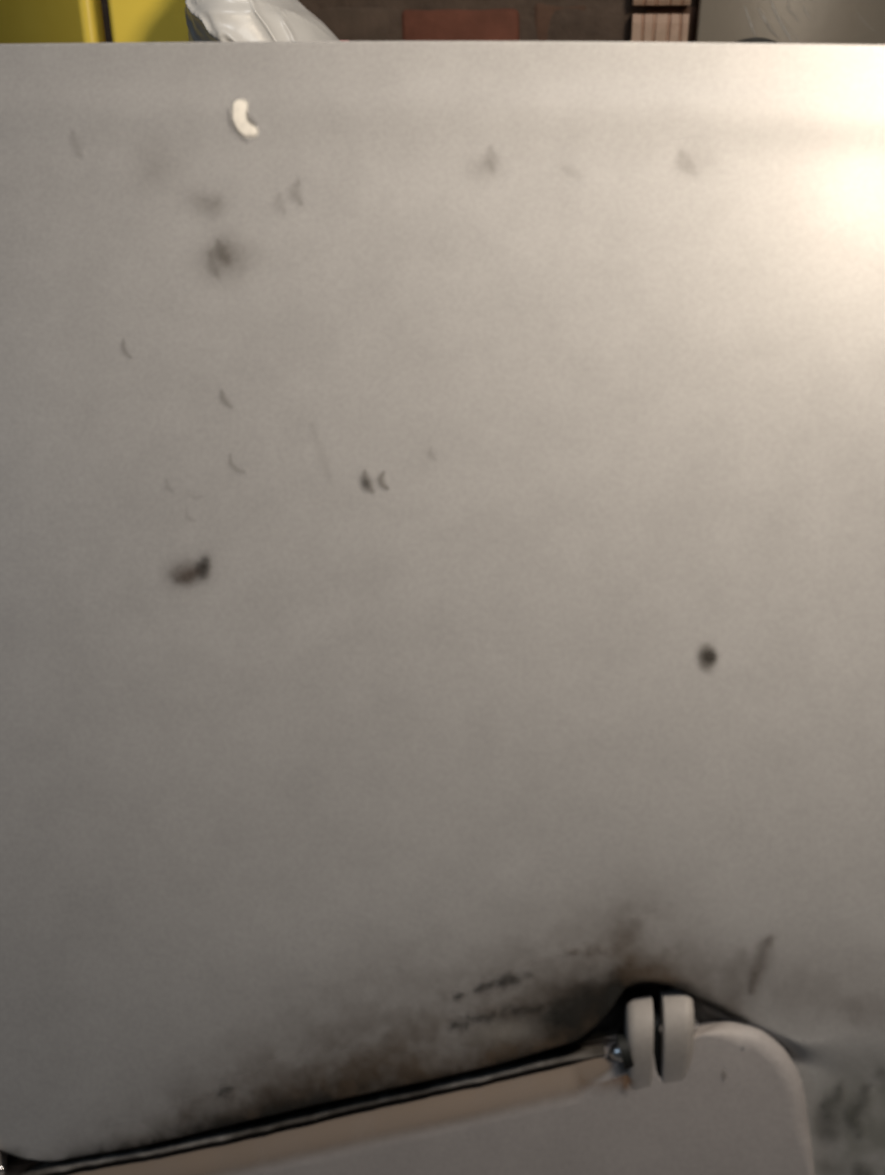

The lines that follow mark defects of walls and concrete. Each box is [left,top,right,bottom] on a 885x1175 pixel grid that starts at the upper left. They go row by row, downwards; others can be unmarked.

damp [180,559,208,579]
damp [702,650,715,664]